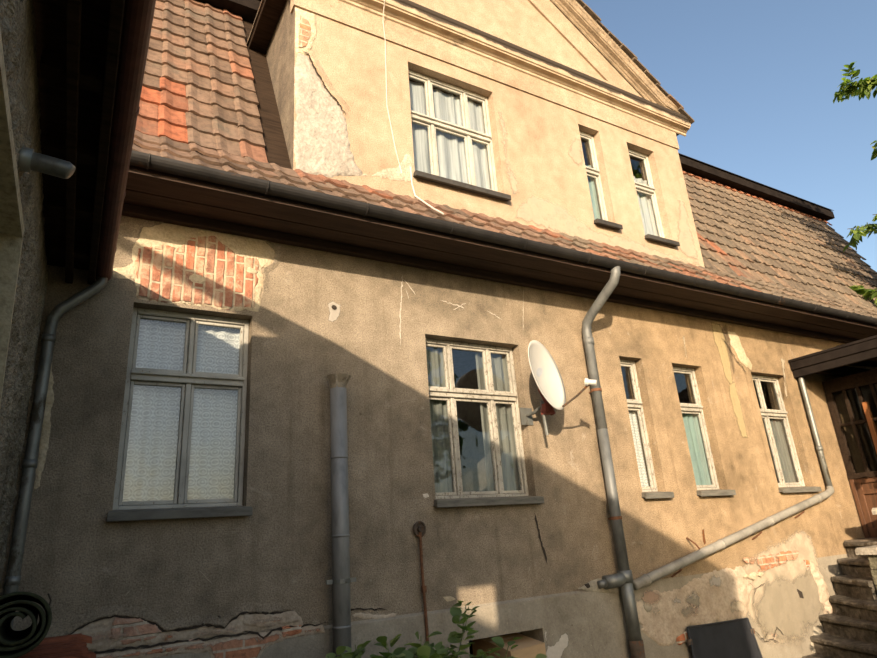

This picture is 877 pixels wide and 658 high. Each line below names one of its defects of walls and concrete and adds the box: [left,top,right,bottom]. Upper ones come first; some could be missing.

spalling [294,7,414,182]
spalling [113,221,281,312]
spalling [52,601,326,658]
peeling [545,630,568,658]
spalling [636,531,820,646]